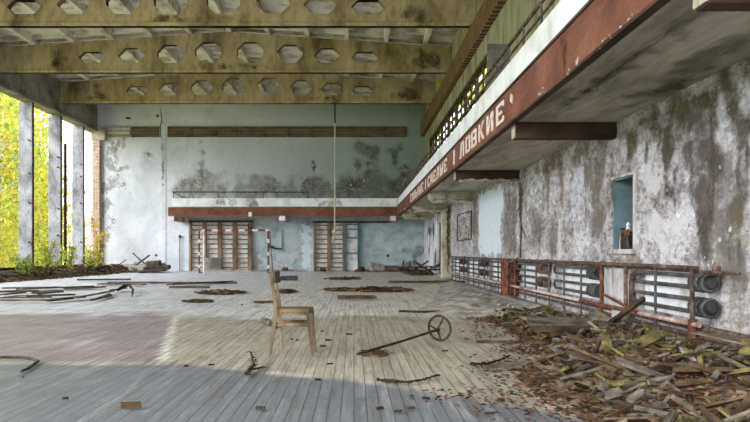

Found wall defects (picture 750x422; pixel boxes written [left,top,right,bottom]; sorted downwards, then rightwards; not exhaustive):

peeling [101,140,126,251]
peeling [252,223,313,271]
mould [235,144,408,206]
leakage [503,140,613,254]
leakage [662,129,677,206]
leakage [683,102,750,293]